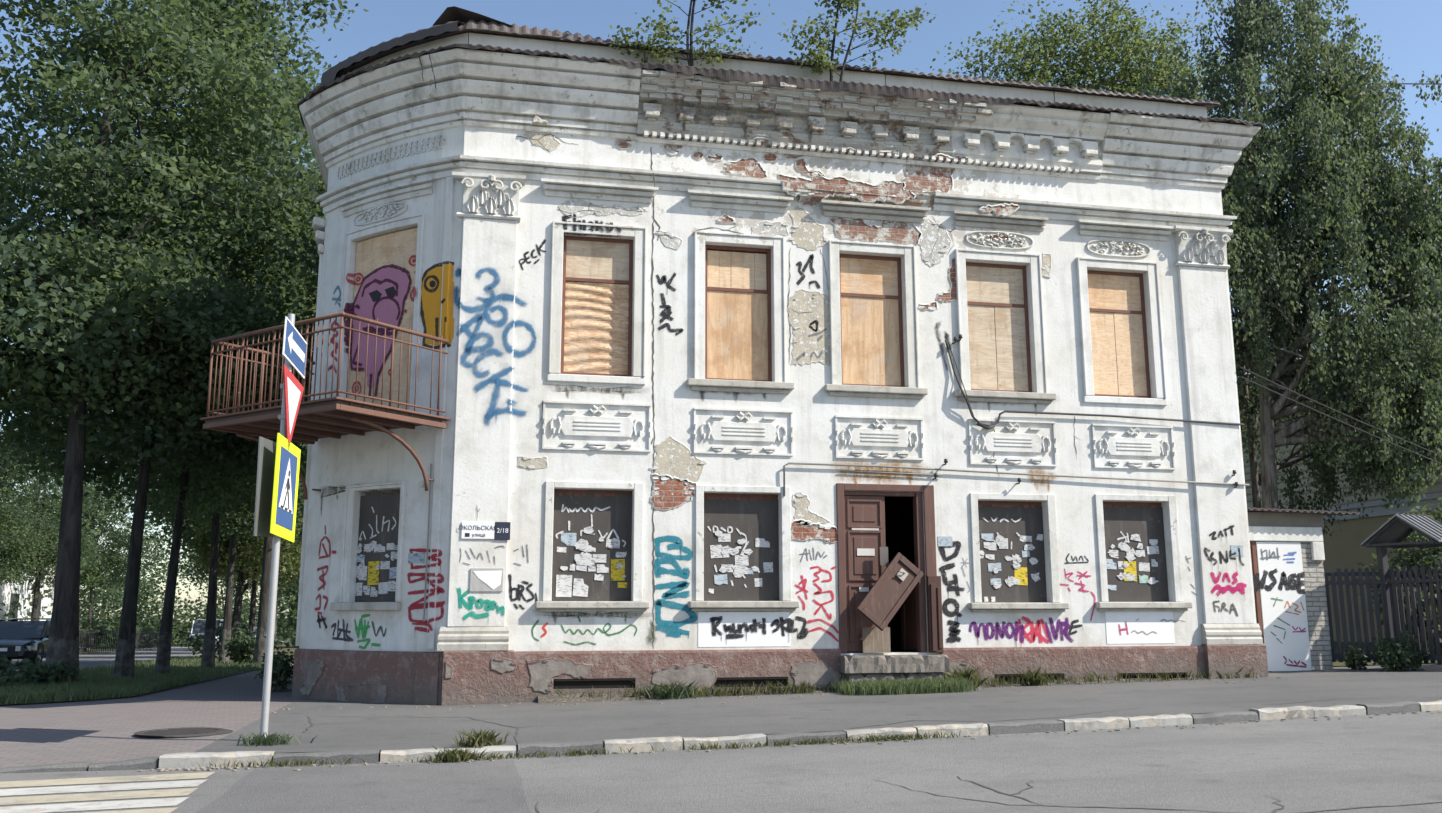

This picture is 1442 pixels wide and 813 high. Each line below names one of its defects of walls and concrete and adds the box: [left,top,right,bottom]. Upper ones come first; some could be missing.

spalling [662,134,968,312]
peeling [787,289,831,366]
peeling [649,435,706,512]
spalling [791,492,838,544]
peeling [444,662,454,679]
peeling [490,657,593,694]